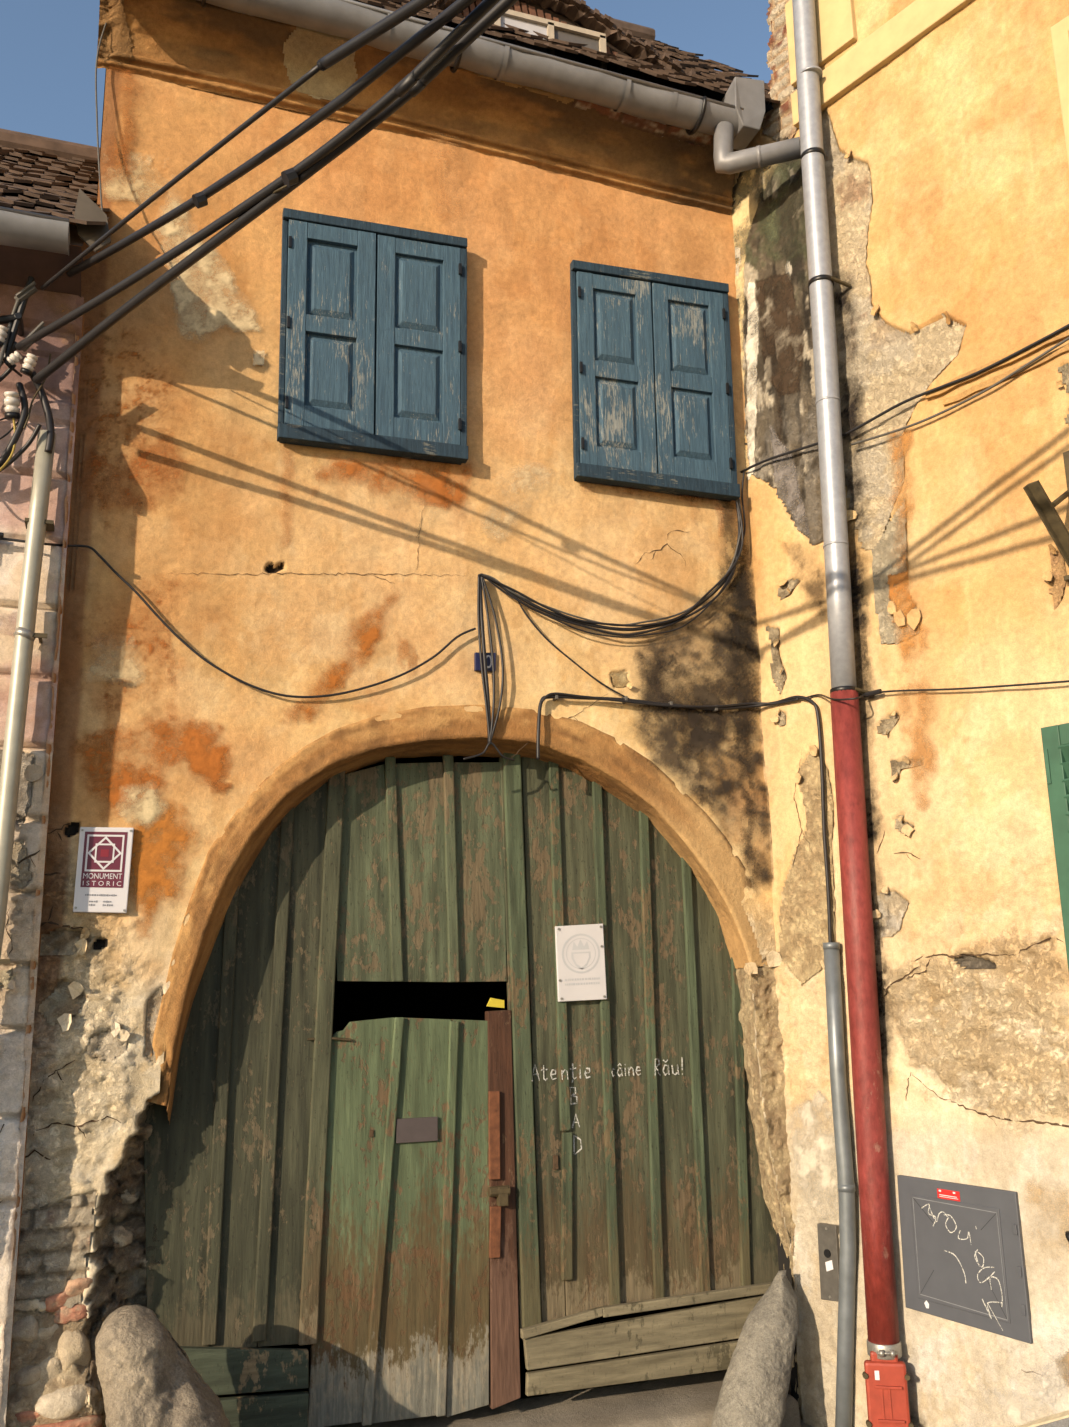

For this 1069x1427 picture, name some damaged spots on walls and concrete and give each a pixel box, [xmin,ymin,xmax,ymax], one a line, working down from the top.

peeling [155,201,259,337]
flaking render [732,159,823,545]
flaking render [821,109,966,645]
crack [172,507,459,583]
water stain [636,500,773,887]
flaking render [766,626,786,726]
water stain [76,721,231,912]
flaking render [744,745,836,1256]
flaking render [872,886,908,937]
crack [884,937,1063,997]
crack [906,1072,1069,1128]
flaking render [5,1190,140,1427]